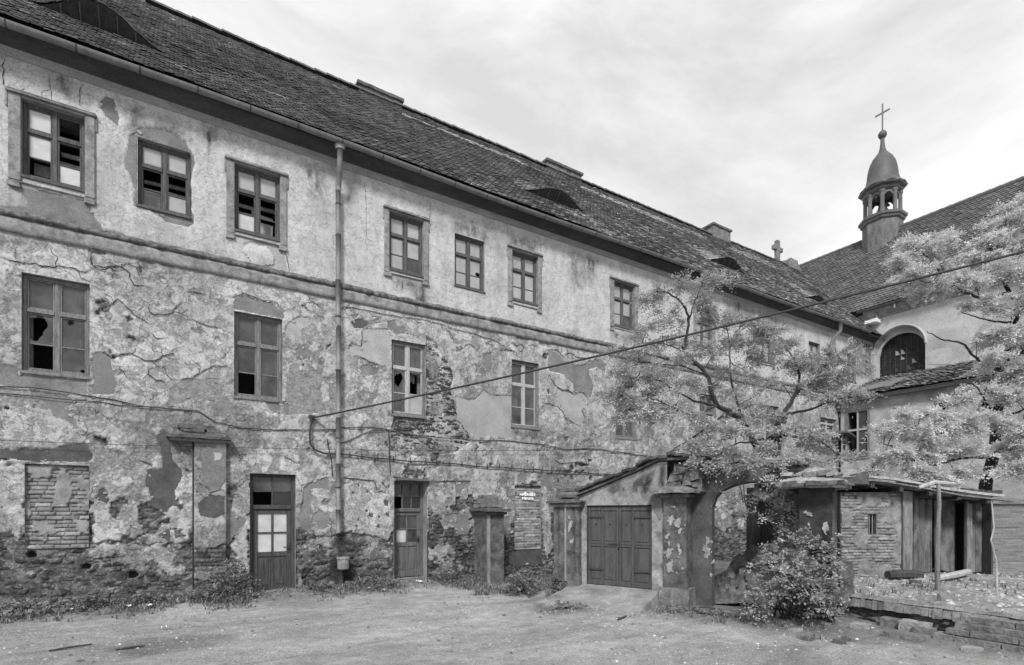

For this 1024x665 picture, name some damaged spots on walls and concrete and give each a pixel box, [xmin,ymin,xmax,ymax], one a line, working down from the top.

spalling [99,96,119,126]
crack [2,249,226,382]
spalling [349,312,409,376]
flaking render [390,337,518,457]
crack [346,307,592,425]
spalling [548,351,606,424]
flaking render [0,529,192,605]
spalling [145,429,183,512]
spalling [198,447,247,546]
flaking render [296,478,393,588]
flaking render [427,482,472,576]
peeling [663,506,686,573]